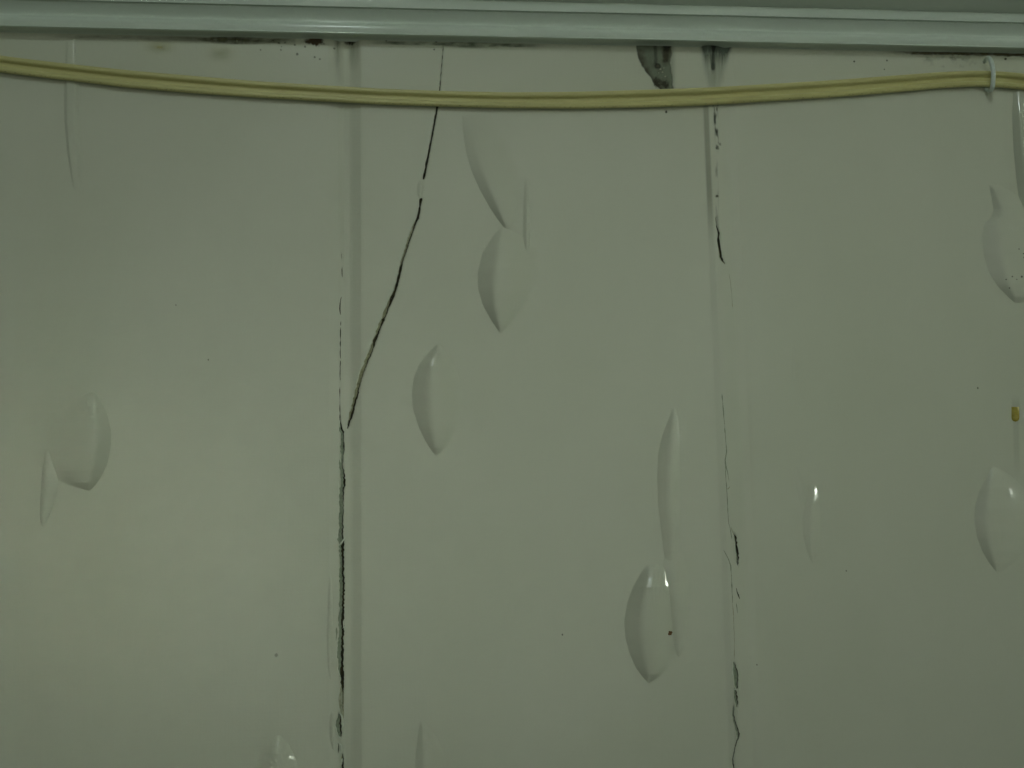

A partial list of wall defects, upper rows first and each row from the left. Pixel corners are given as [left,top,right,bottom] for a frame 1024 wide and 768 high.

crack [335,46,444,768]
crack [716,226,733,308]
crack [722,396,740,768]